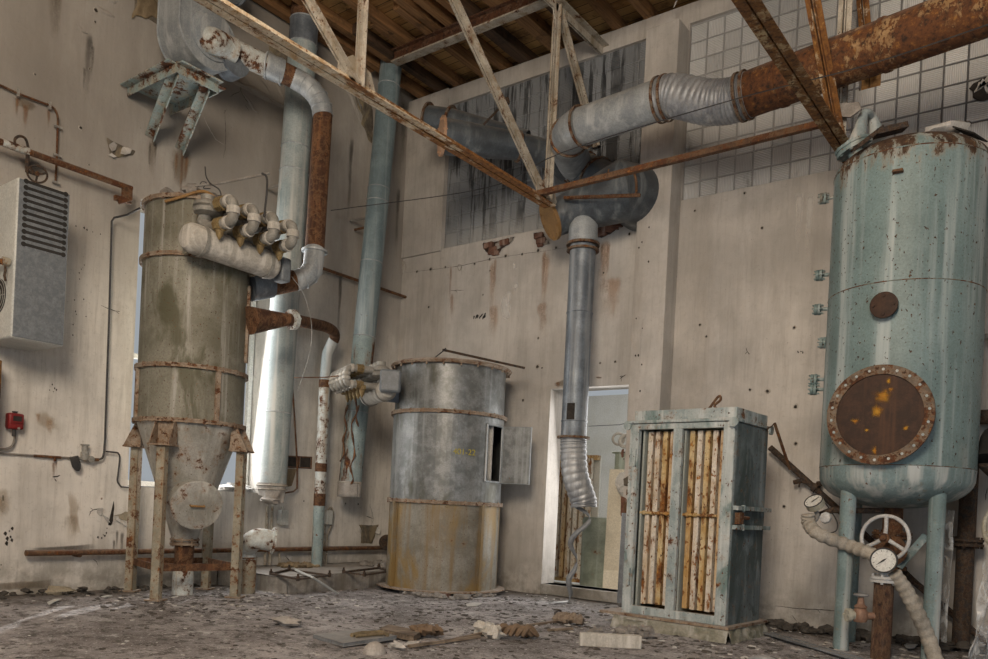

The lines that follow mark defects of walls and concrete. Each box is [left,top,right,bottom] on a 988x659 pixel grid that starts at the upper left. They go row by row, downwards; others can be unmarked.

spalling [482,236,515,272]
spalling [533,232,558,253]